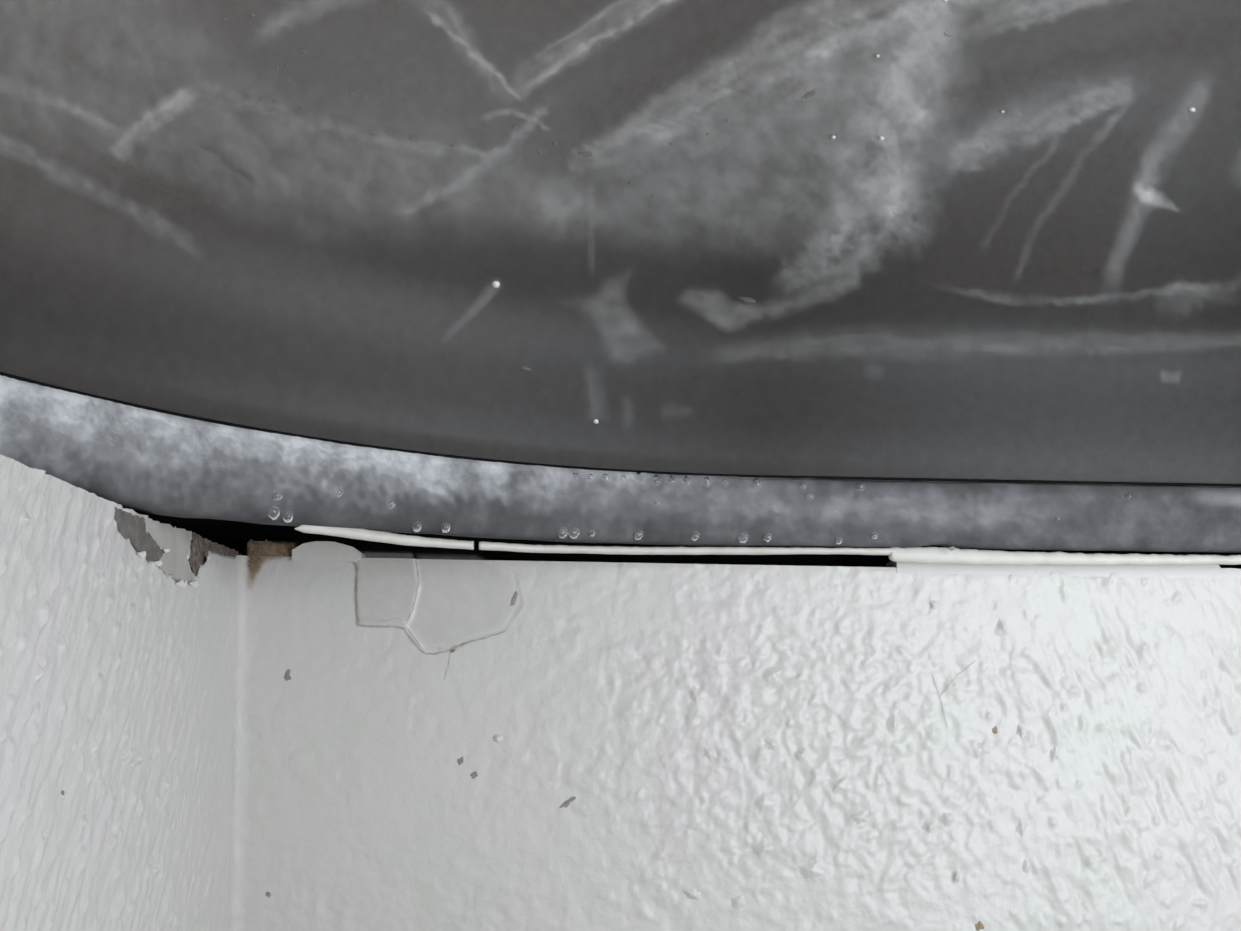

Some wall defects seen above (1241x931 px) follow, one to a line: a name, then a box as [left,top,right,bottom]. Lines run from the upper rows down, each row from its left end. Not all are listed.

peeling [114,507,243,588]